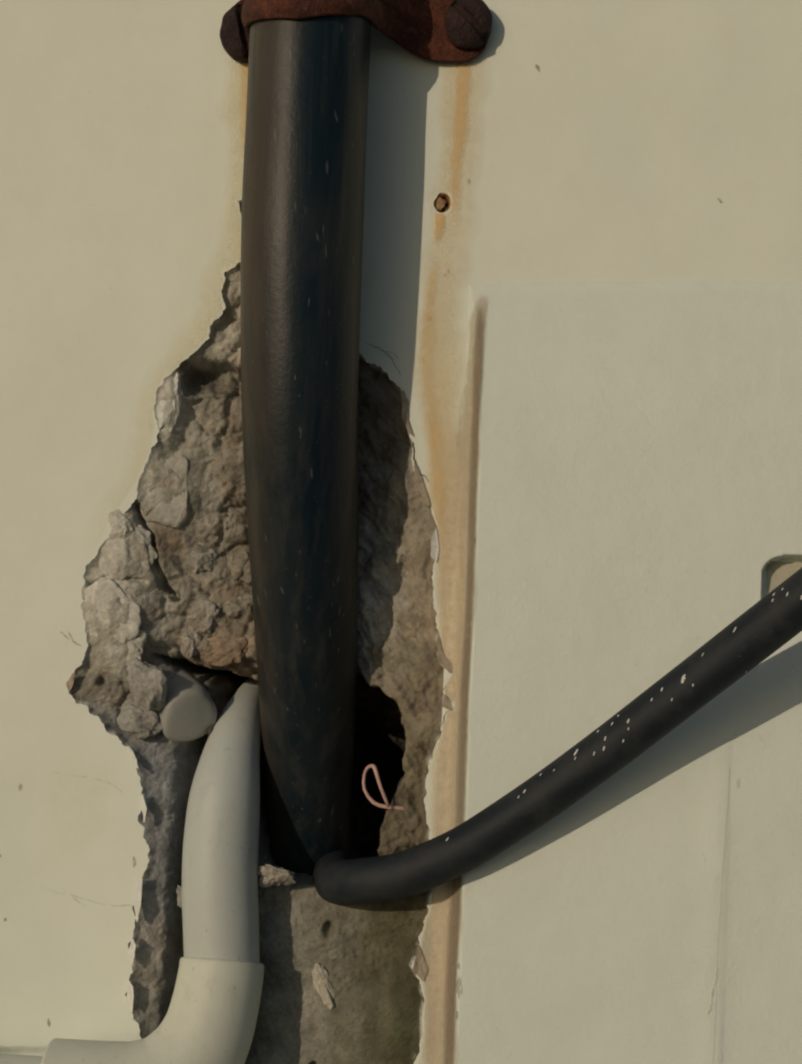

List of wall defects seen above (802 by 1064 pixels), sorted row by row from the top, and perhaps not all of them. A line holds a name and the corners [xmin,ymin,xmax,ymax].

spalling [66,262,258,1039]
spalling [245,736,432,1064]
spalling [351,353,453,858]